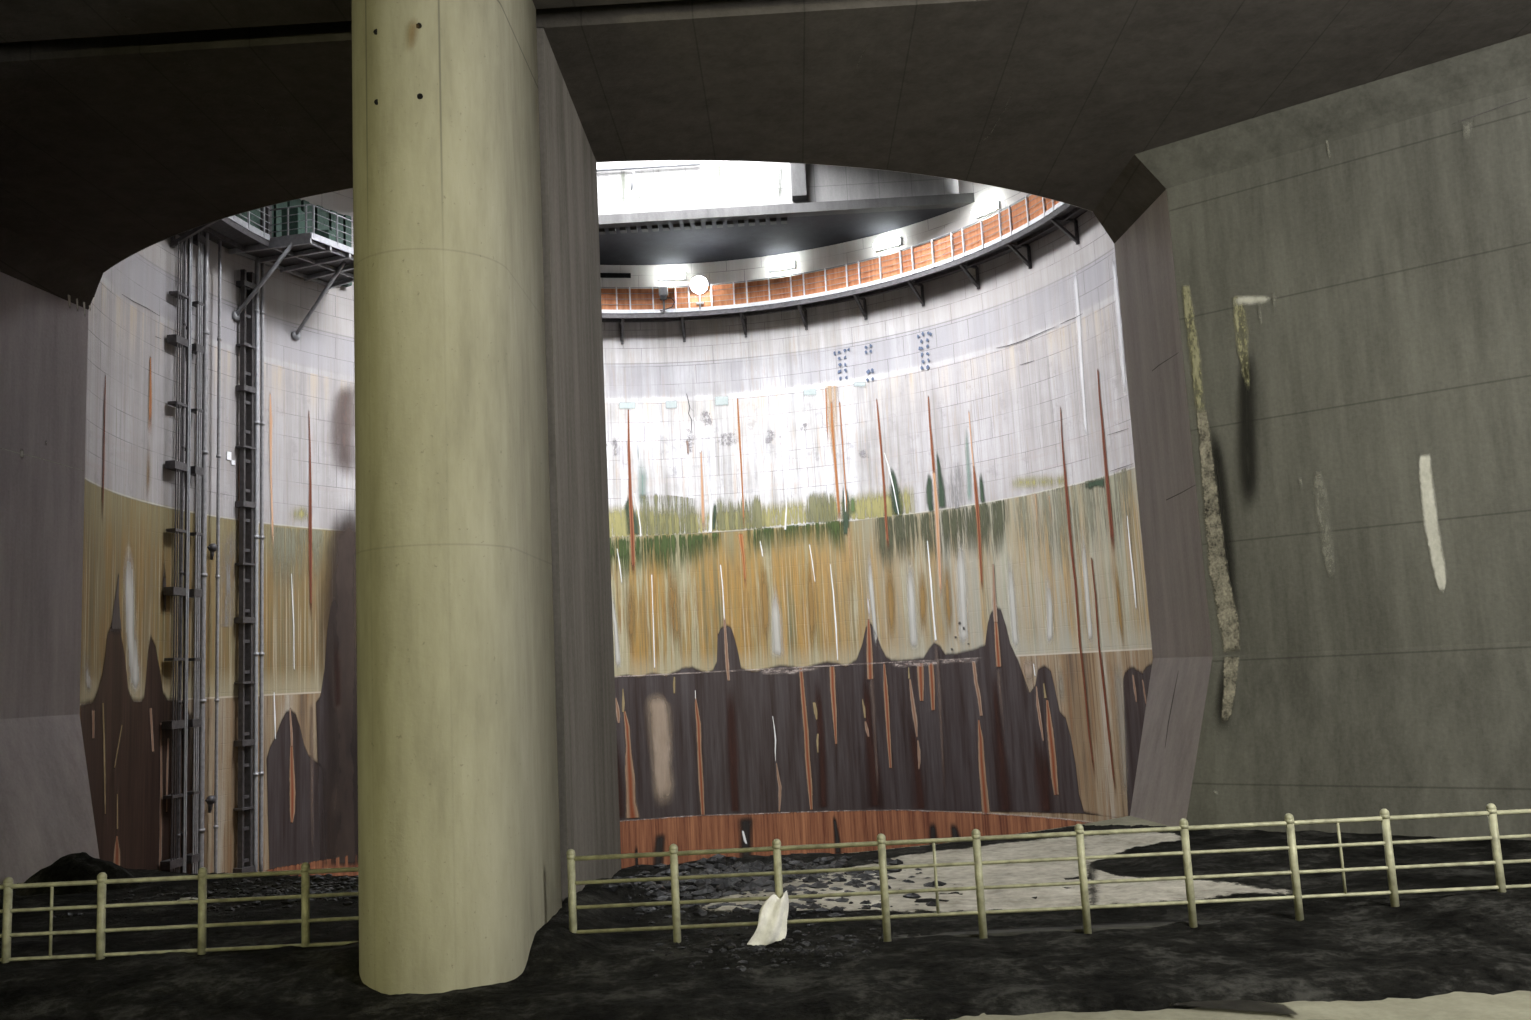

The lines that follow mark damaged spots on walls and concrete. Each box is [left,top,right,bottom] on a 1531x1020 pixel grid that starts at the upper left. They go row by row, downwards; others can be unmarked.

water stain [81,563,193,874]
water stain [267,516,358,869]
rust [825,385,851,552]
rust [615,652,1086,869]
water stain [613,541,1099,823]
rust [862,602,892,768]
rust [876,399,889,543]
rust [920,396,951,625]
rust [1032,408,1115,785]
rust [1097,370,1114,544]
water stain [1183,286,1276,719]
water stain [1419,456,1446,589]